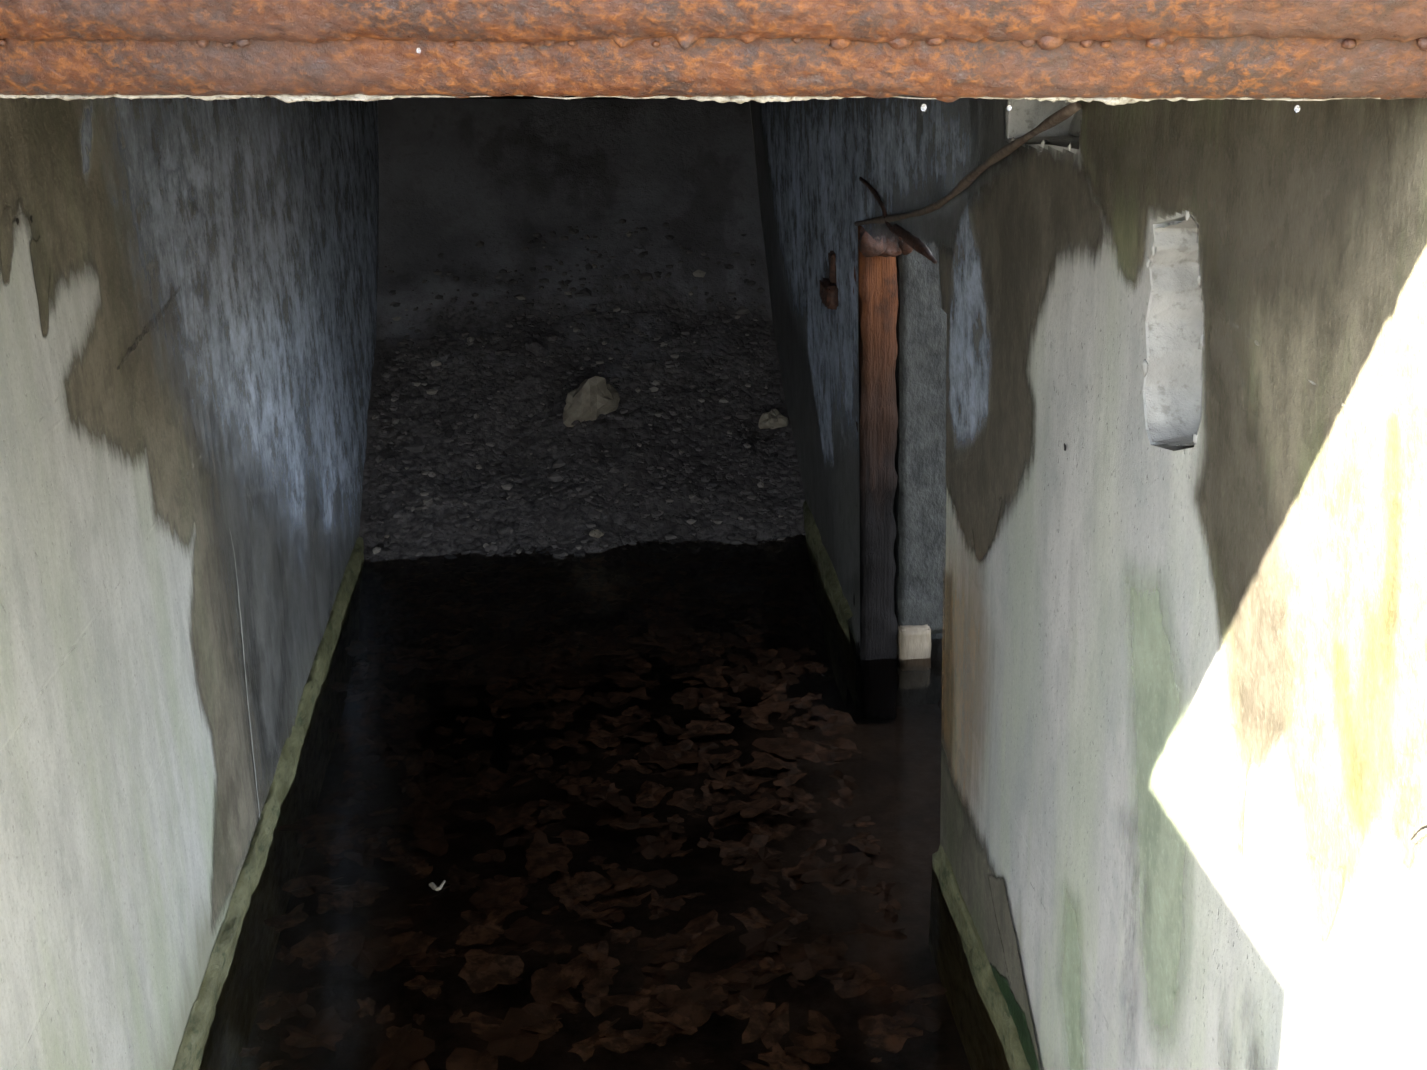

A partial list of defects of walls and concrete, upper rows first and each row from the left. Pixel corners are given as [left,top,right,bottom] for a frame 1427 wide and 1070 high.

corrosion [1020,36,1111,50]
water stain [0,94,492,928]
water stain [516,95,1427,944]